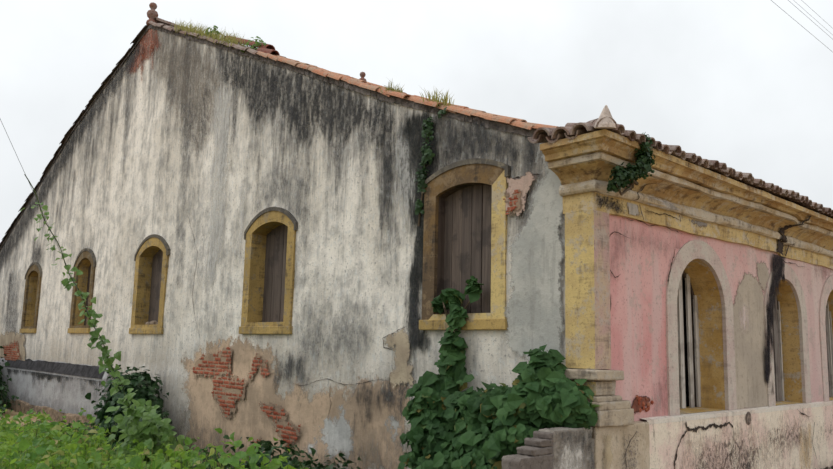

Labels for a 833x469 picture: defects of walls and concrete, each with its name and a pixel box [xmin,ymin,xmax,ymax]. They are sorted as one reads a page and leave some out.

corrosion [127,27,161,80]
leakage [159,36,534,357]
flaking render [503,171,539,217]
crack [777,216,811,267]
flaking render [0,331,25,361]
flaking render [733,261,769,409]
leakage [764,254,785,383]
flaking render [181,327,416,469]
leakage [354,378,413,422]
flaking render [631,395,654,414]
crack [674,422,740,469]